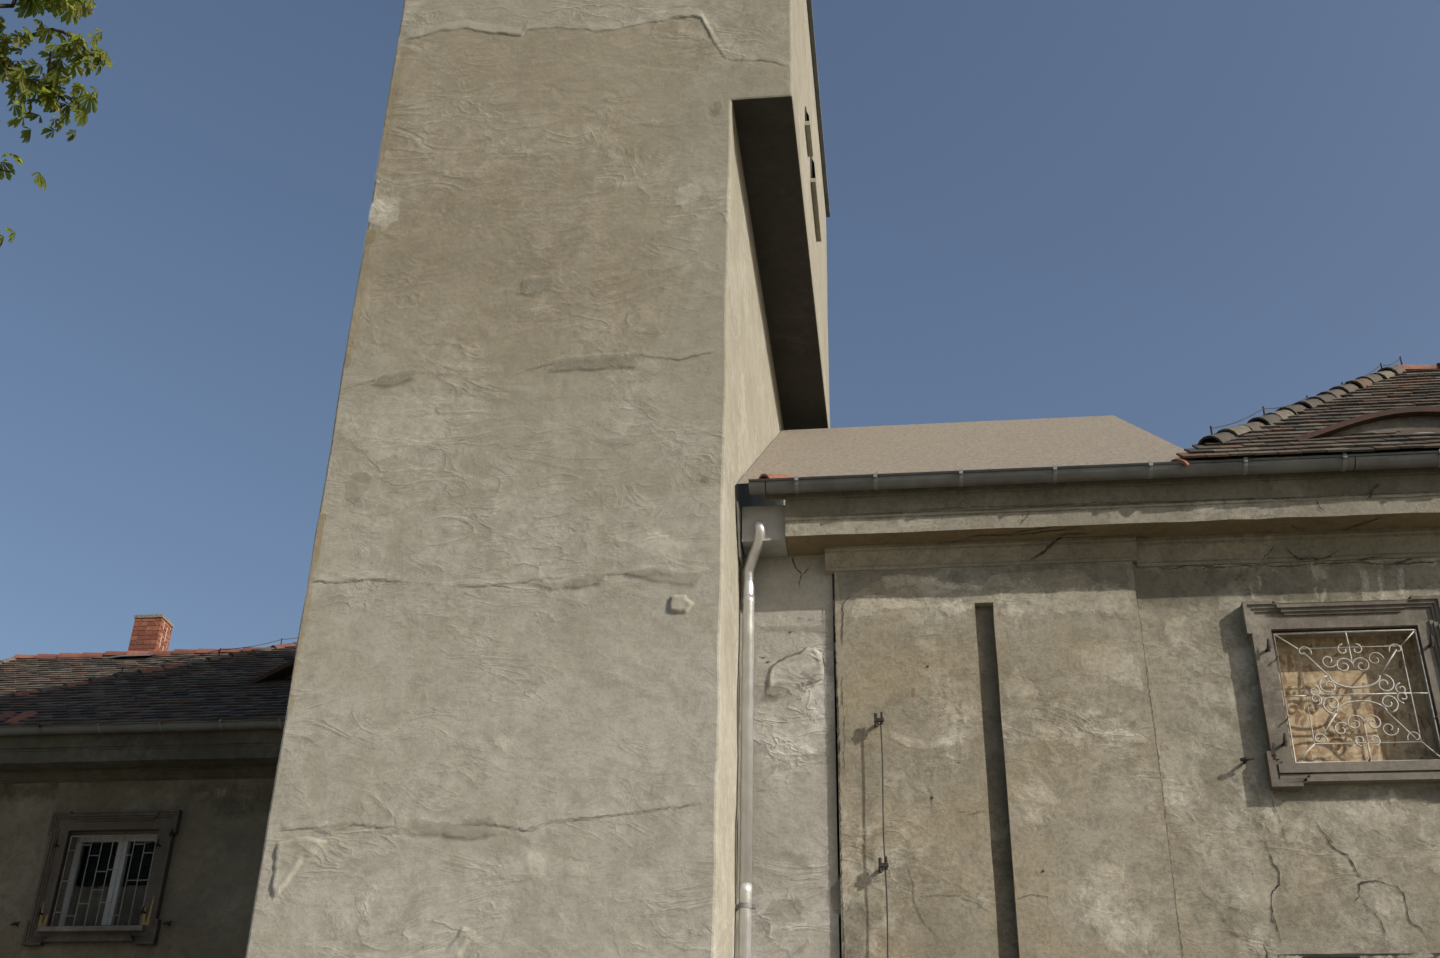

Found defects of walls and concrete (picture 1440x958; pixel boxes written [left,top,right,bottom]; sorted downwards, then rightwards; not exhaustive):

crack [309,576,406,584]
crack [889,483,1440,958]
crack [452,803,706,830]